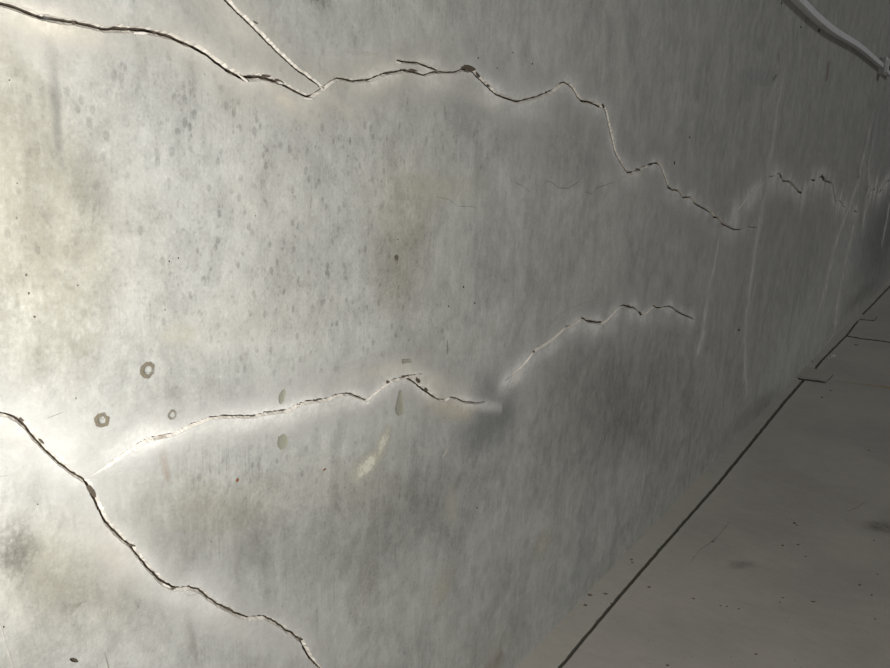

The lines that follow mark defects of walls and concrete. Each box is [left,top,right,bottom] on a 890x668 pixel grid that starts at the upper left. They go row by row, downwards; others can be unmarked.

crack [0,0,890,251]
crack [0,295,697,668]